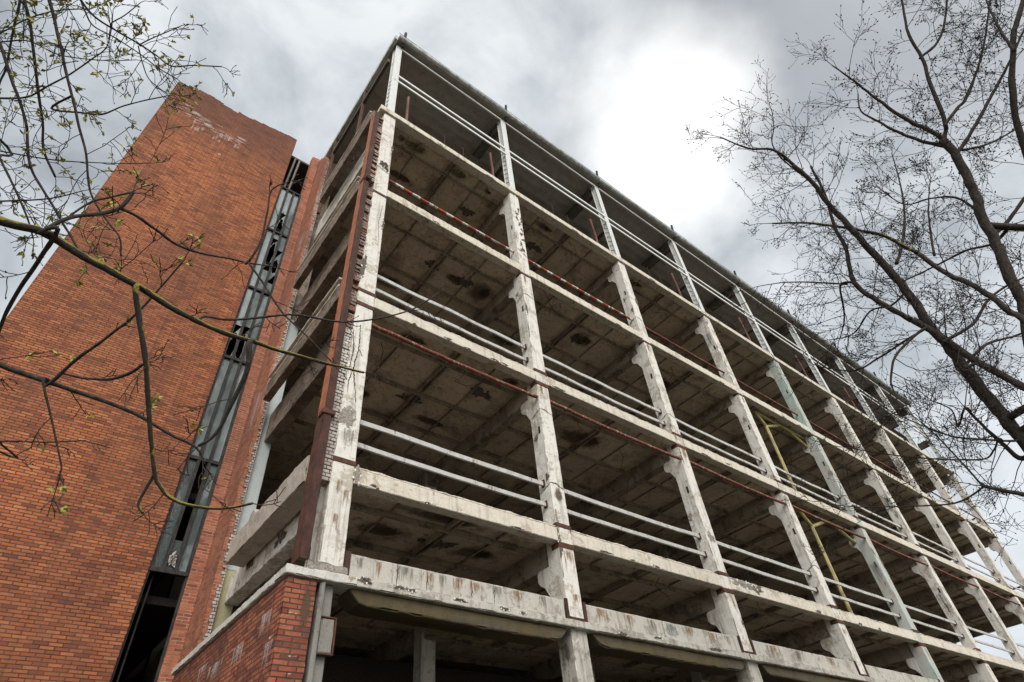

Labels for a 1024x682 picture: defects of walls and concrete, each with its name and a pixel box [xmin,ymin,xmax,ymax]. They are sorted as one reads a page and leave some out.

spalling [337,406,357,428]
leakage [410,511,470,526]
leakage [359,523,399,536]